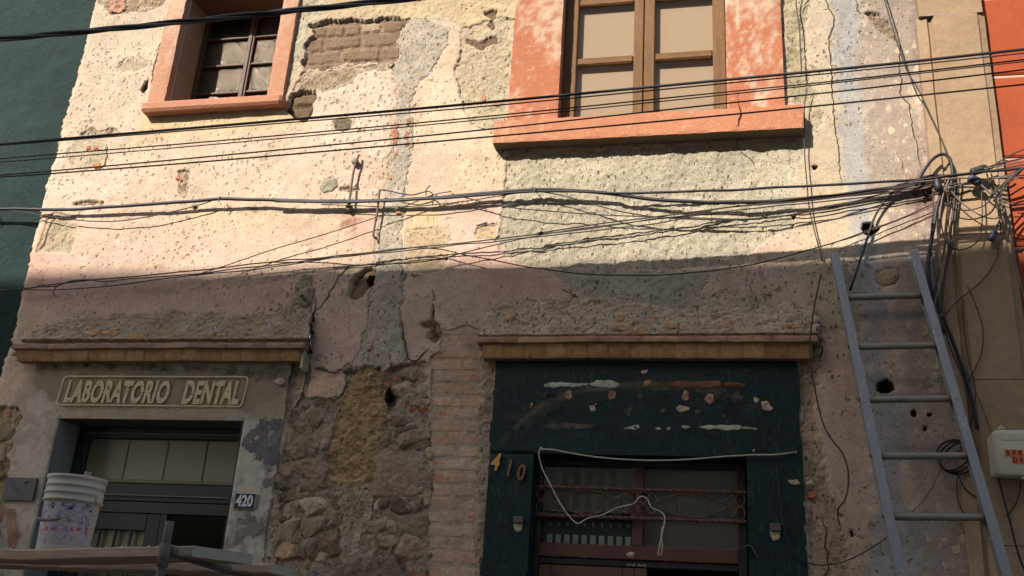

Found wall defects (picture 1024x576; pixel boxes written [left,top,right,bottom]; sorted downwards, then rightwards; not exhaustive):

flaking render [303,19,407,71]
crack [802,0,874,187]
crack [896,45,920,170]
spalling [392,118,410,155]
spalling [350,270,376,300]
crack [304,265,350,396]
spalling [422,313,442,343]
peeling [661,390,714,415]
spalling [733,391,773,411]
flaking render [0,407,23,549]
flaking render [234,361,434,576]